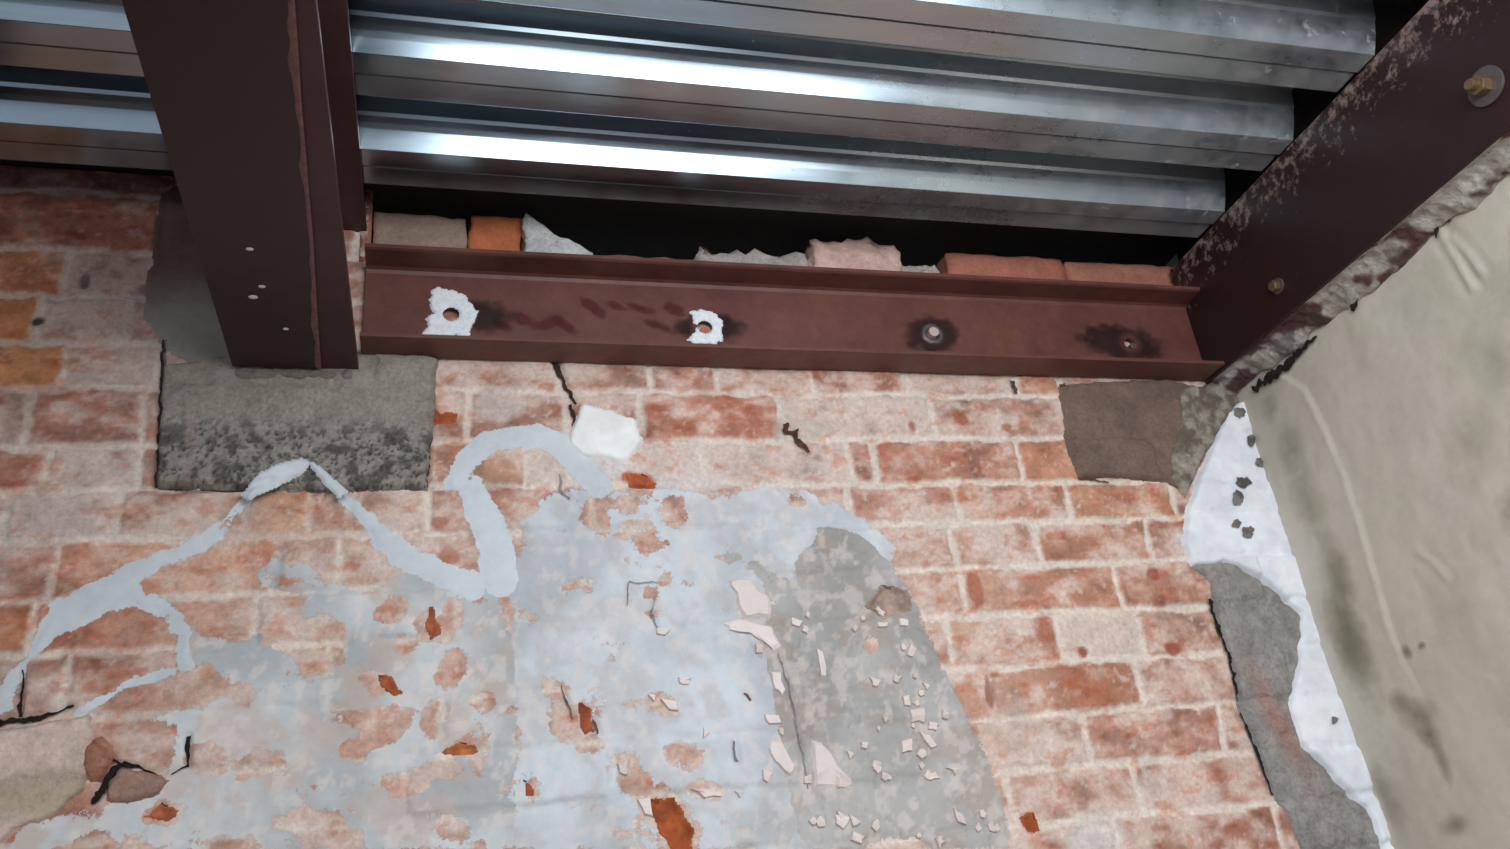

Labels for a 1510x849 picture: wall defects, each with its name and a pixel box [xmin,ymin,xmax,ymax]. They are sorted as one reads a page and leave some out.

crack [552,362,577,426]
flaking render [569,404,657,489]
flaking render [1232,435,1264,538]
crack [0,670,74,727]
spalling [83,736,179,822]
crack [91,736,191,805]
spalling [378,675,403,696]
spalling [442,742,478,756]
spalling [578,702,594,734]
spalling [851,585,958,781]
spalling [637,796,694,849]
spalling [1019,812,1039,833]